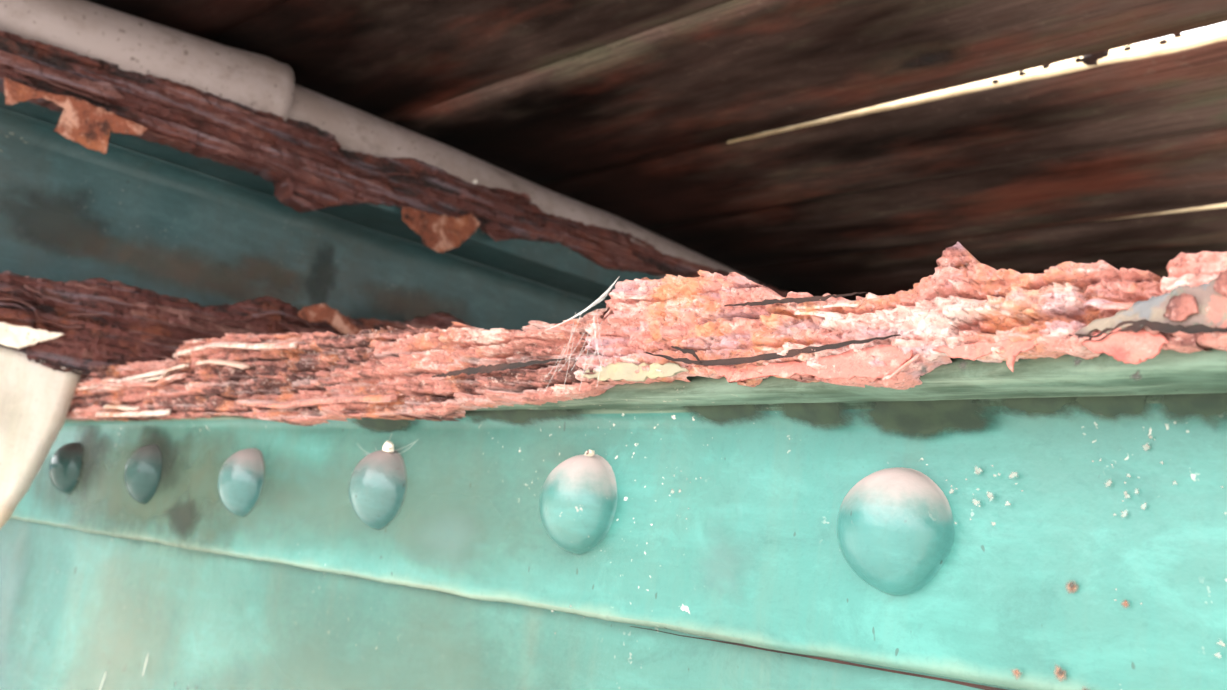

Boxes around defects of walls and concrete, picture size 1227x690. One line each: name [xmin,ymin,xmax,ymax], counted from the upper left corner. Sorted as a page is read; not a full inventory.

rust [3,77,149,154]
rust [401,207,516,253]
rust [281,304,362,334]
rust [574,242,1200,390]
peeling [1063,251,1227,380]
rust [1159,331,1210,353]